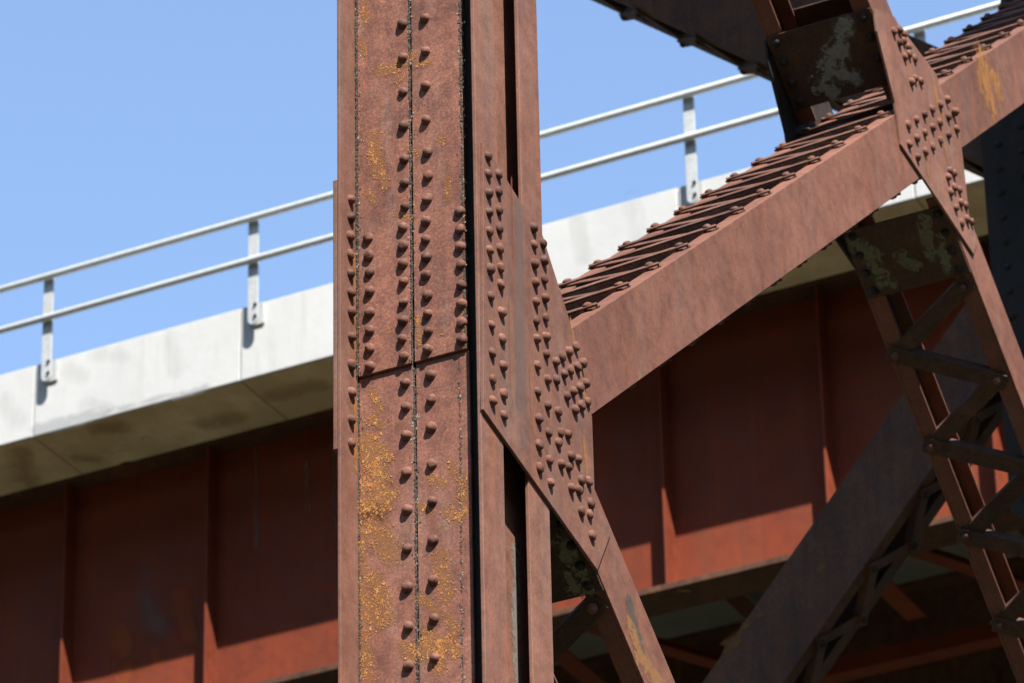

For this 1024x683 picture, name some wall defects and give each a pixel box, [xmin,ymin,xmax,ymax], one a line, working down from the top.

peeling [812,17,862,100]
corrosion [977,44,1004,118]